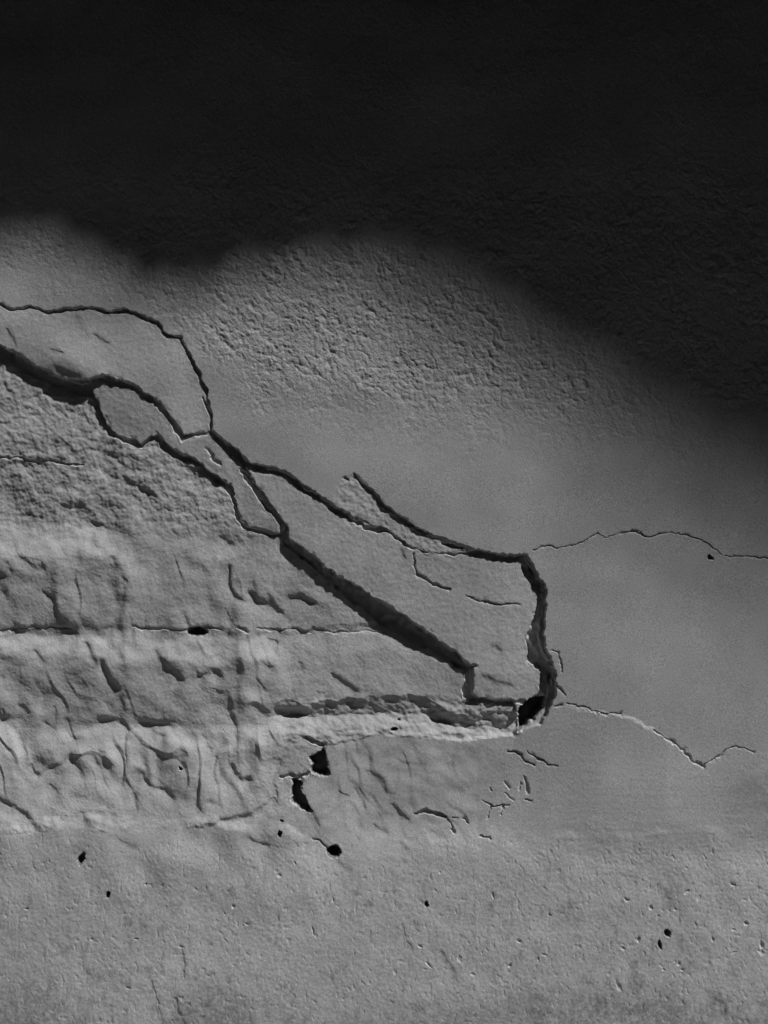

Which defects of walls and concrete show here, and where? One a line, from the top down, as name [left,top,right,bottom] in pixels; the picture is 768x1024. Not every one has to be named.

flaking render [0,344,518,846]
crack [0,303,768,839]